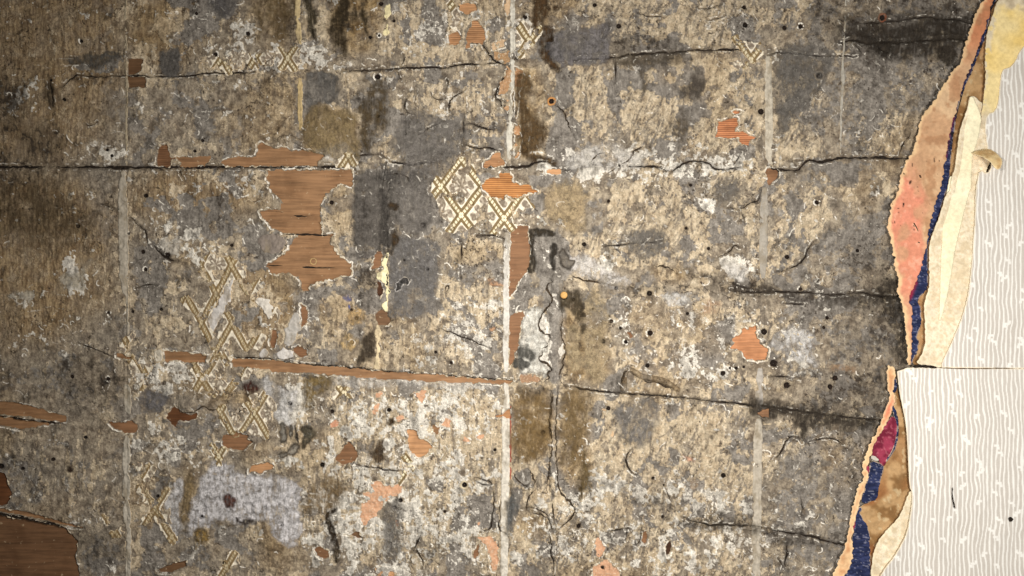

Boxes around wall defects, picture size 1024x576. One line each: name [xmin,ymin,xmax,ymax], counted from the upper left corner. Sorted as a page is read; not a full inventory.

crack [772,16,962,57]
crack [0,154,423,185]
crack [770,132,911,172]
peeling [157,111,543,415]
crack [570,386,880,460]
peeling [0,472,84,576]
crack [527,507,554,571]
crack [665,488,845,565]